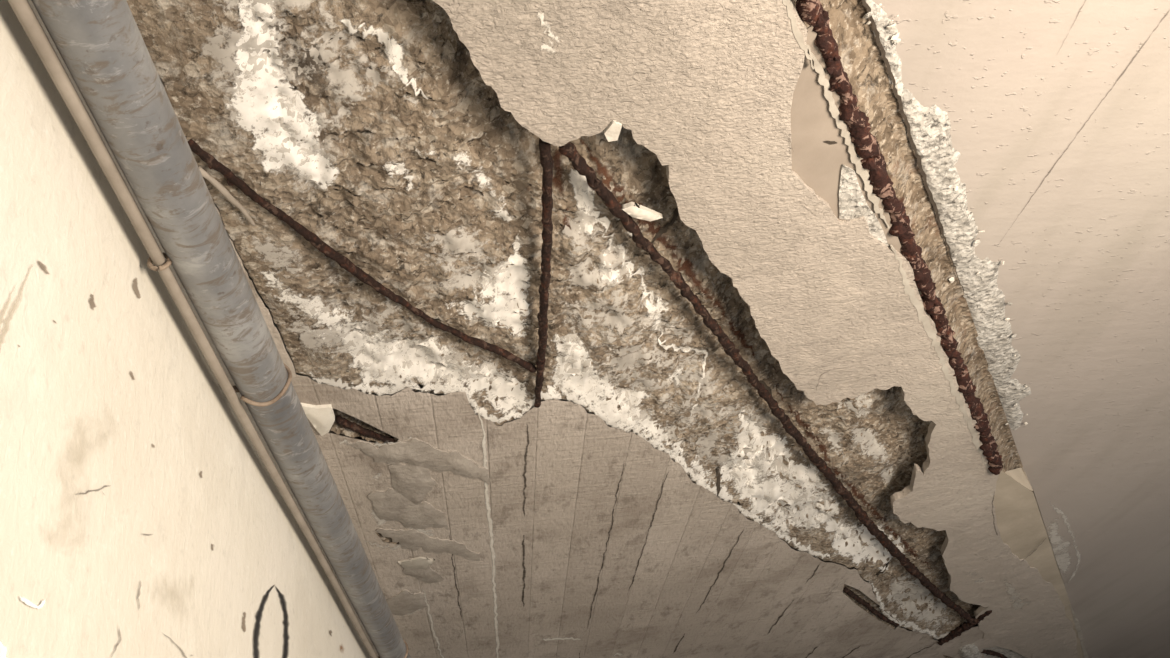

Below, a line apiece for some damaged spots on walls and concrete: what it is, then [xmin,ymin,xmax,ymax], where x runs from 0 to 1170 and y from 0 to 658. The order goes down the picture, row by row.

leakage [202,0,428,198]
spalling [126,0,981,640]
corrosion [553,149,563,192]
corrosion [581,140,642,205]
crack [652,208,679,243]
corrosion [638,219,755,358]
spalling [782,0,1023,472]
crack [521,425,529,607]
crack [588,465,624,625]
crack [714,467,722,496]
corrosion [775,384,929,569]
spalling [982,646,1026,658]